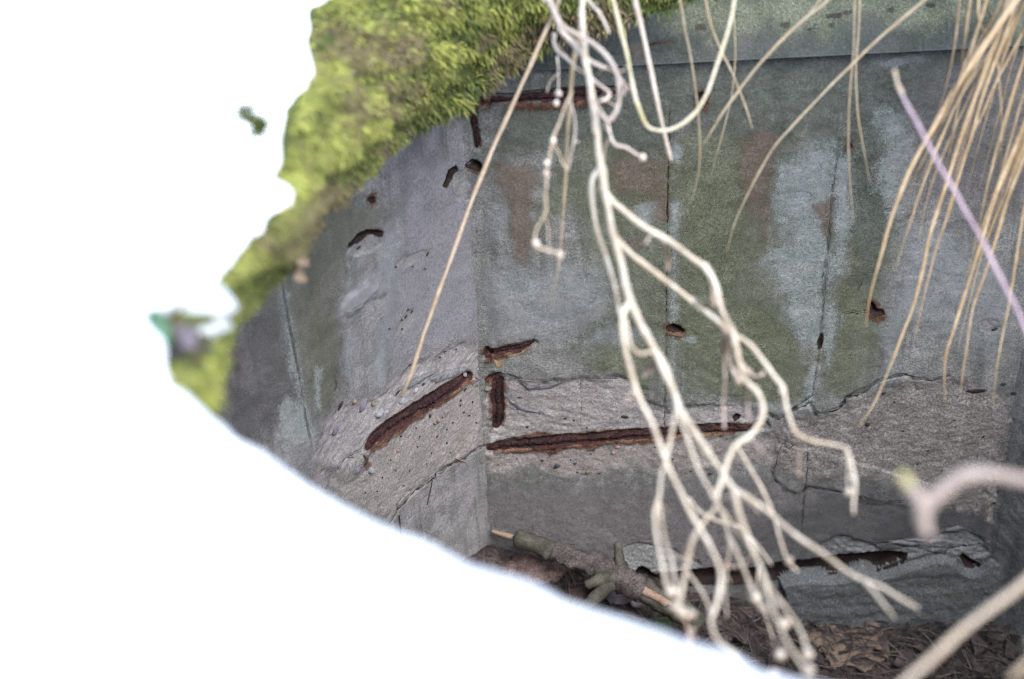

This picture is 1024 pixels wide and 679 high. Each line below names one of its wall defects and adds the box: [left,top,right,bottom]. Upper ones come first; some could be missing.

rust [470,87,616,148]
rust [363,340,763,469]
damp [490,263,652,393]
spalling [310,340,1017,560]
damp [702,108,911,417]
crack [754,354,948,545]
crack [821,141,885,327]